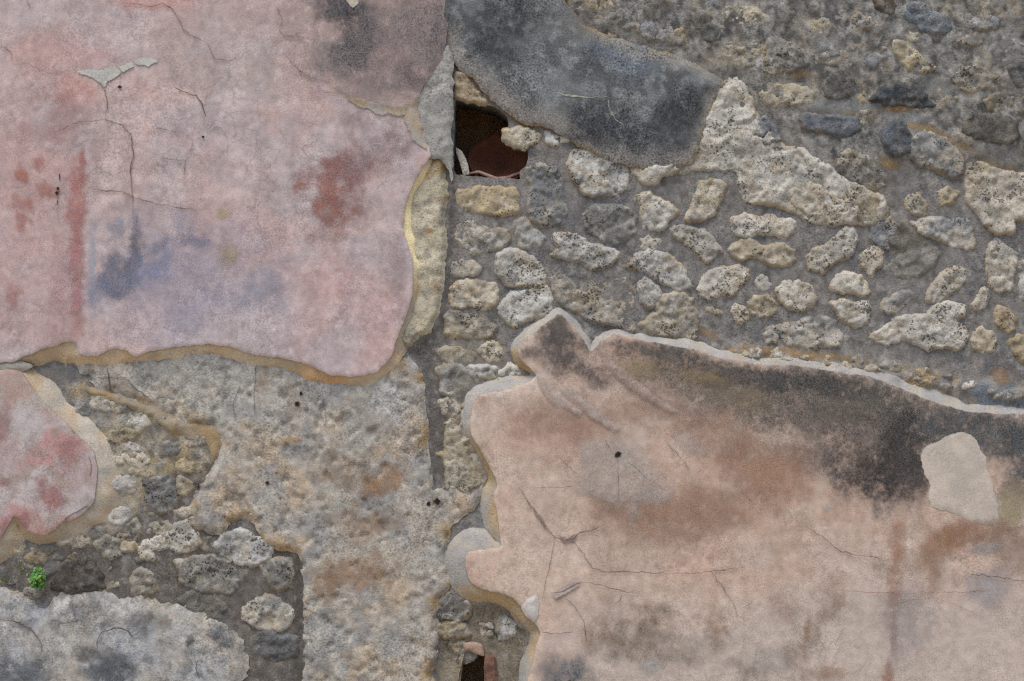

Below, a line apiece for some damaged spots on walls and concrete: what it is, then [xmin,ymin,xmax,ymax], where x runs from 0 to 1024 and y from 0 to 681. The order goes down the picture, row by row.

crack [128,3,240,61]
crack [58,83,197,221]
crack [152,87,244,174]
water stain [617,339,1024,524]
crack [518,443,753,638]